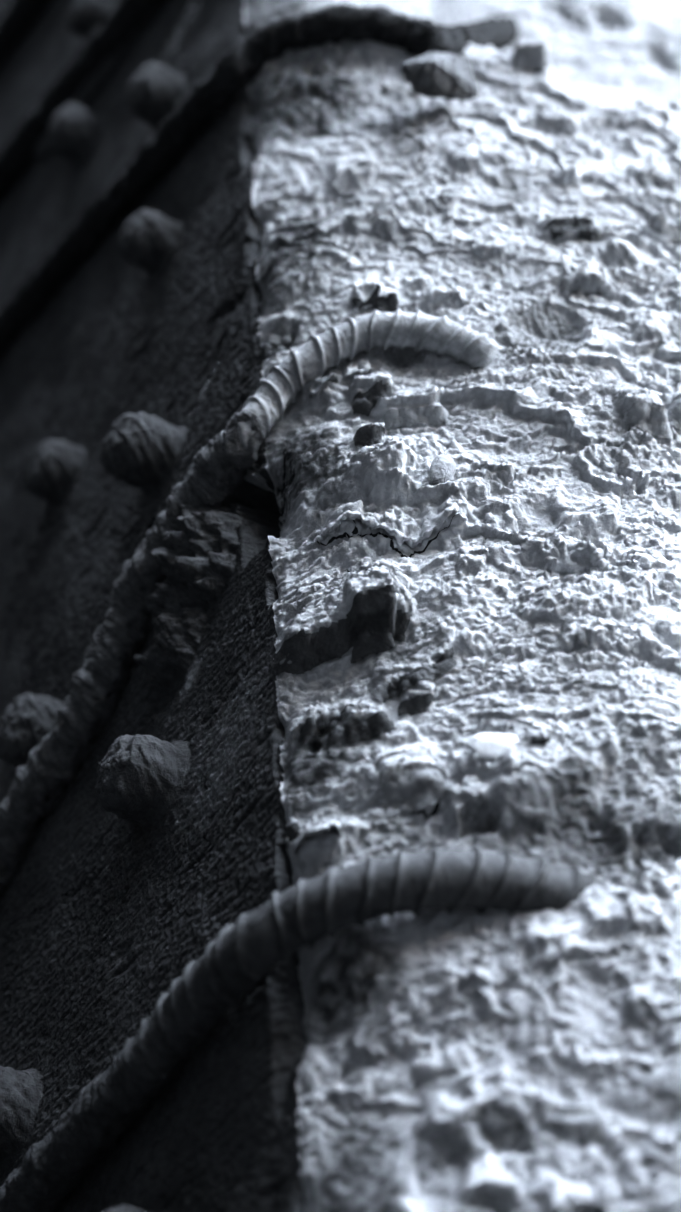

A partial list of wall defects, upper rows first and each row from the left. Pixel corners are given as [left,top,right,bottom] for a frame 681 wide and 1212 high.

crack [304,513,460,573]